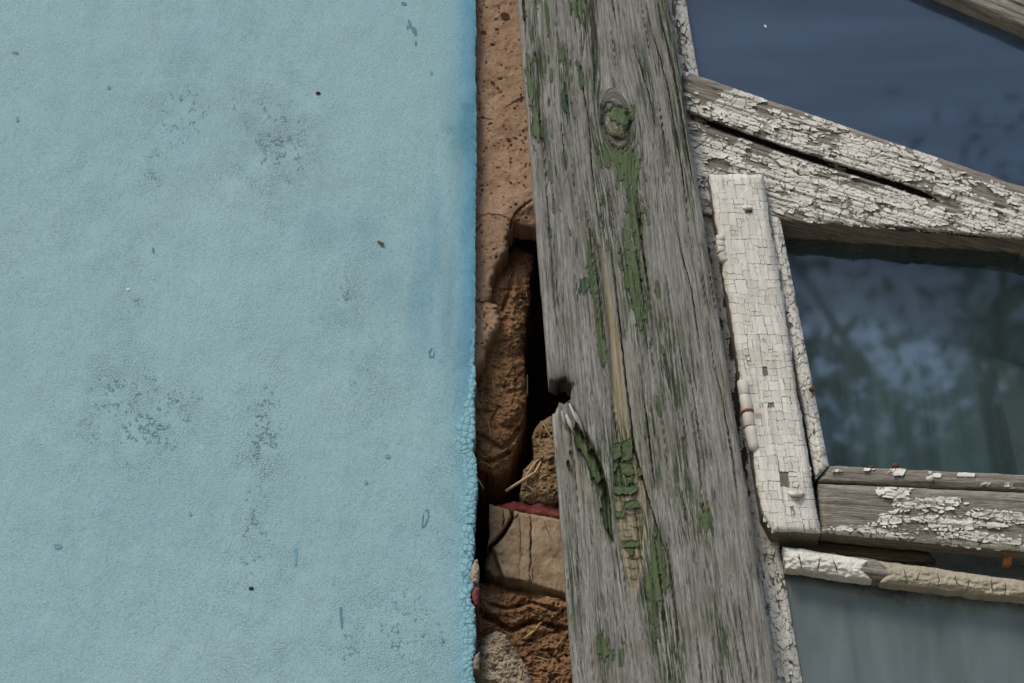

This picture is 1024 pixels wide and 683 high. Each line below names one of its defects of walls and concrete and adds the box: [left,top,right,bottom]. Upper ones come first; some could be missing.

peeling [500,0,590,151]
peeling [600,103,634,127]
peeling [745,114,848,147]
peeling [755,146,846,197]
peeling [899,154,968,204]
peeling [596,139,660,331]
crack [634,0,938,493]
peeling [822,214,864,227]
peeling [971,184,1024,227]
peeling [578,219,607,367]
peeling [875,468,1024,551]